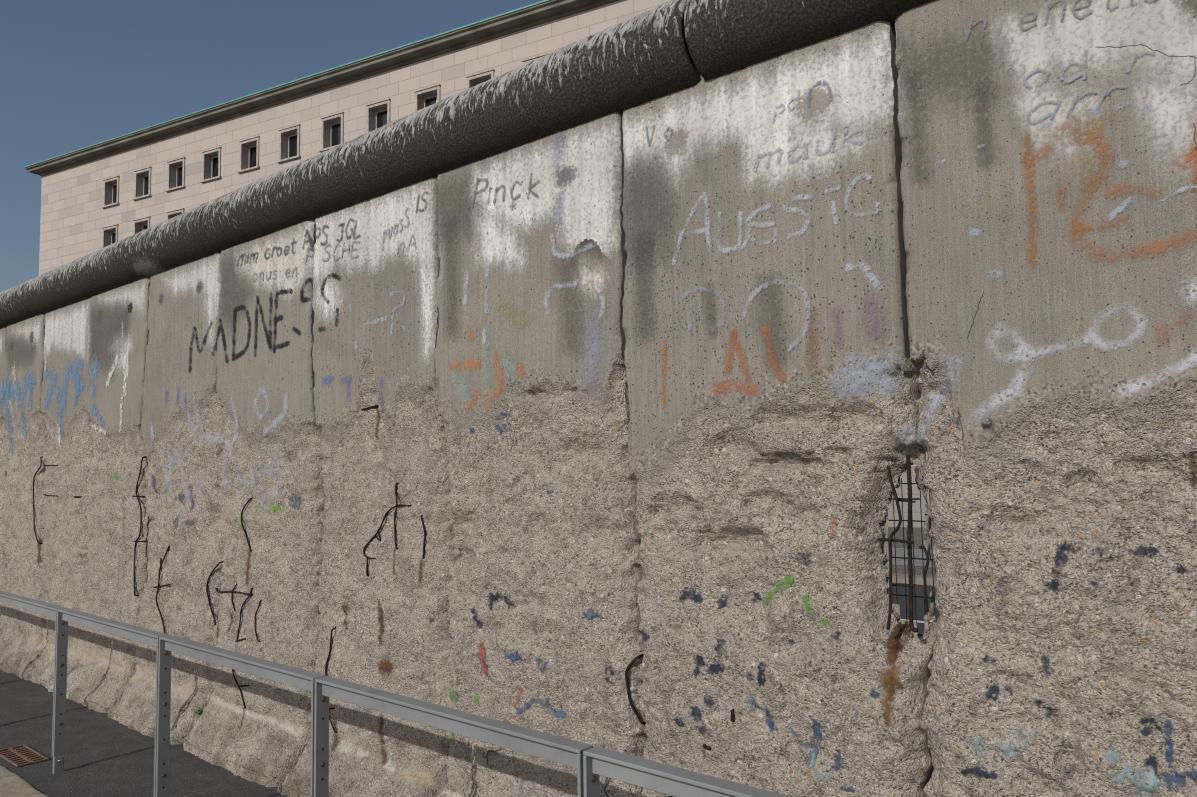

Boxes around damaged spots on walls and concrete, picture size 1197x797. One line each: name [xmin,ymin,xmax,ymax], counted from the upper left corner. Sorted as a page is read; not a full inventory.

peeling [580,266,603,292]
peeling [108,322,133,382]
rust [1182,453,1197,486]
spalling [0,353,1197,797]
rust [881,623,908,724]